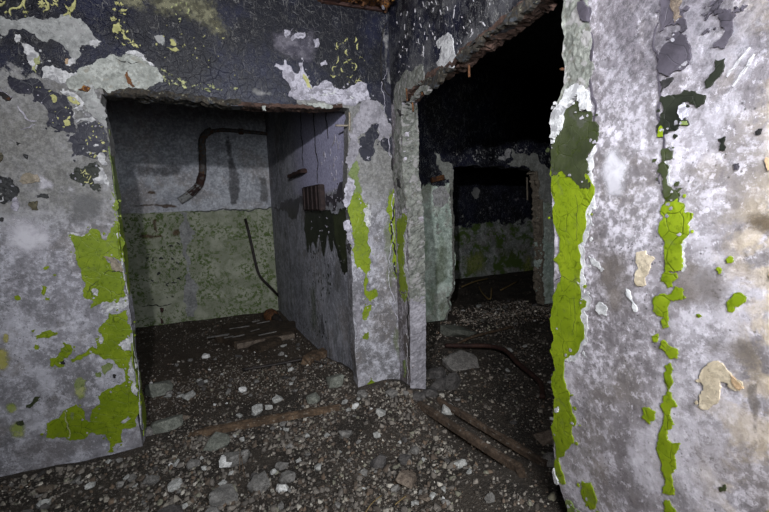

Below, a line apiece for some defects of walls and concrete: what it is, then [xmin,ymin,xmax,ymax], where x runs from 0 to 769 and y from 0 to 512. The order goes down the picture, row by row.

peeling [0,0,242,453]
water stain [748,214,769,231]
peeling [625,0,748,512]
water stain [671,263,725,302]
water stain [729,341,758,364]
water stain [749,385,760,415]
peeling [565,481,598,512]